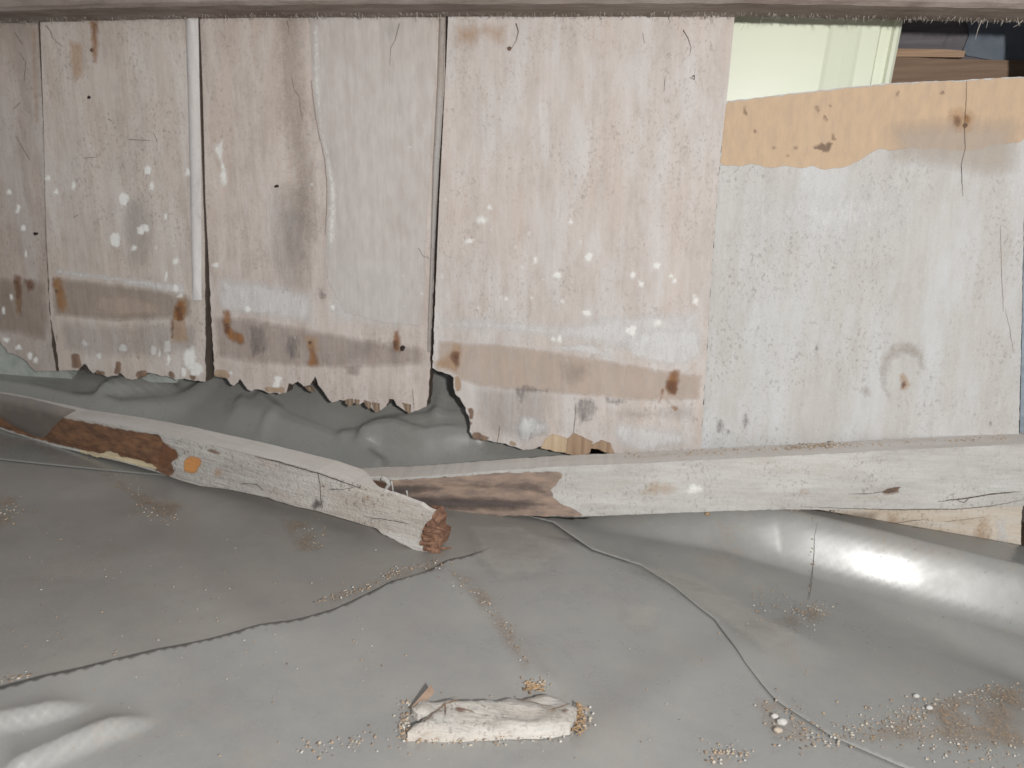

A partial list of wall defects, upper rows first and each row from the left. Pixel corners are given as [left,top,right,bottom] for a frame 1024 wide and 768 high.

peeling [720,78,1024,169]
leakage [110,233,120,247]
leakage [221,282,310,319]
spalling [71,354,81,368]
leakage [151,340,203,376]
leakage [441,295,698,399]
rust [662,372,678,393]
spalling [468,408,488,440]
spalling [541,433,614,455]